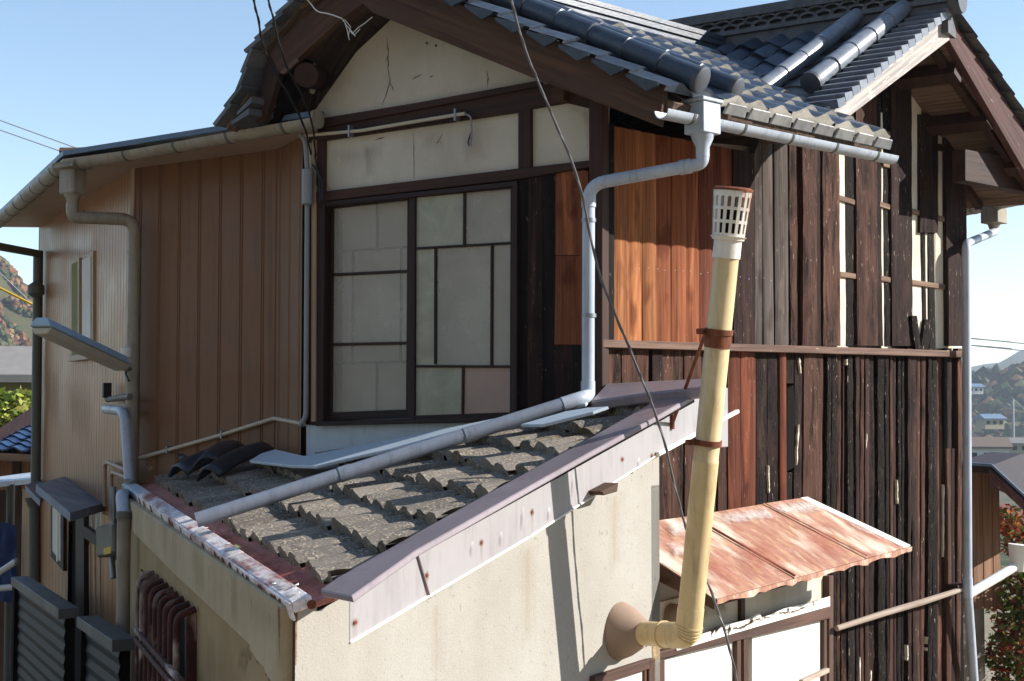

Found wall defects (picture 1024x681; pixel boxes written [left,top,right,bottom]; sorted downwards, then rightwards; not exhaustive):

crack [382,45,432,104]
corrosion [138,498,281,621]
corrosion [296,600,317,647]